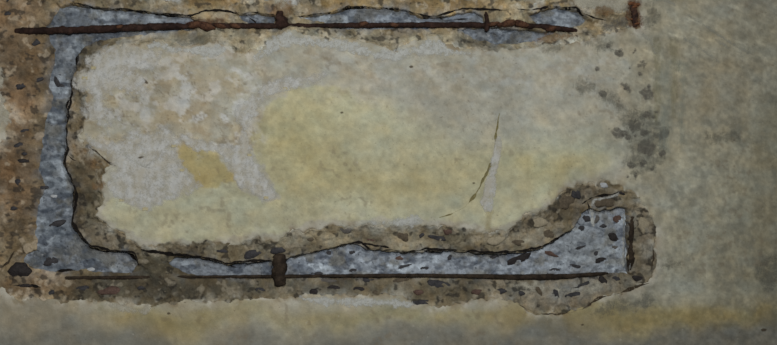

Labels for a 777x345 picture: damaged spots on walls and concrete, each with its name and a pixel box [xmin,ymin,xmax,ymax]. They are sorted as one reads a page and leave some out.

crack [74,3,274,23]
crack [295,5,501,20]
crack [520,6,606,21]
crack [63,52,572,267]
spalling [0,0,657,315]
spalling [612,120,669,165]
crack [582,192,618,214]
crack [520,211,655,315]